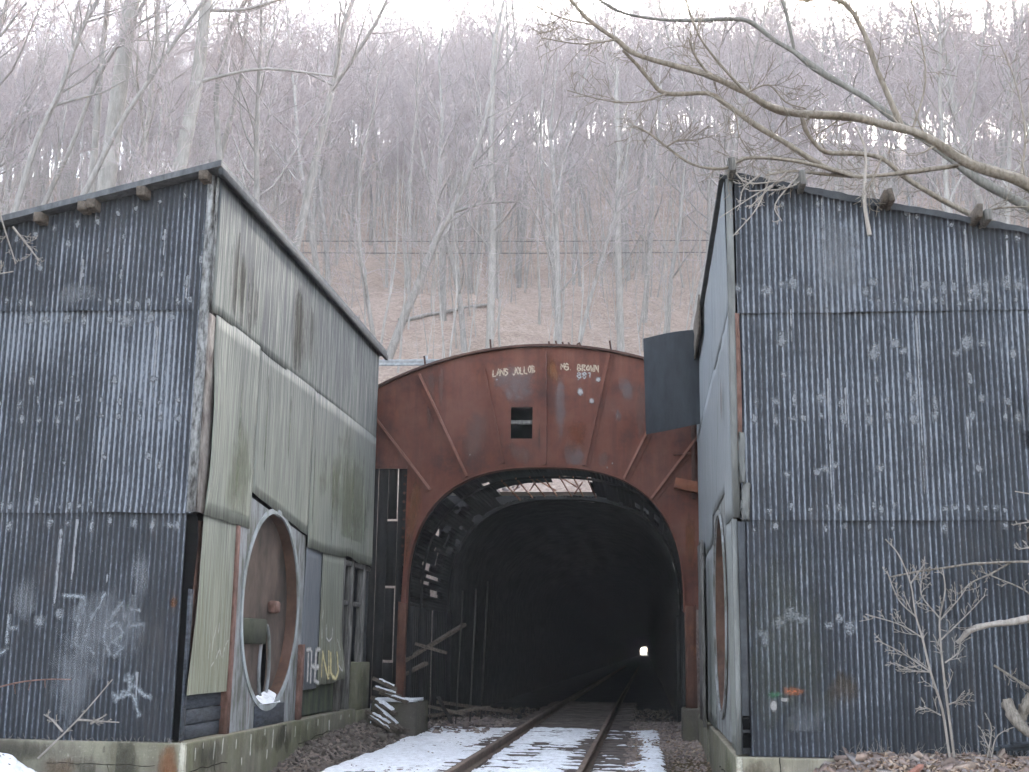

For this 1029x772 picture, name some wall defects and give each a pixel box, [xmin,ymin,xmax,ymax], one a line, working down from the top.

leakage [294,293,313,365]